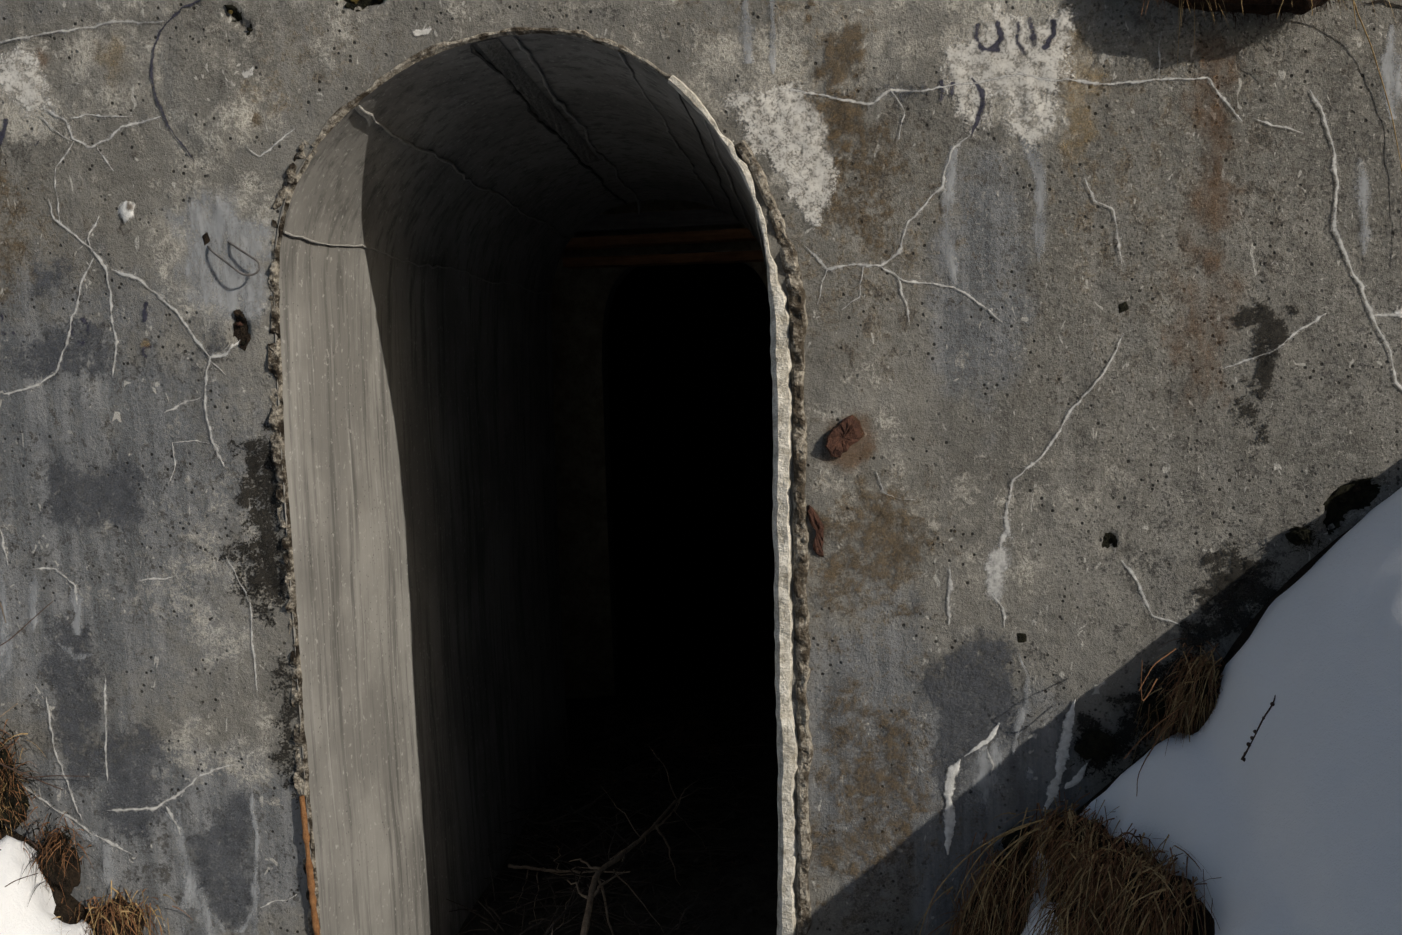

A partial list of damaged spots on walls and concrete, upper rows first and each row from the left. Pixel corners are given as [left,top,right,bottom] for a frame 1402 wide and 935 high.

spalling [344,0,383,12]
crack [0,0,240,484]
crack [778,34,1402,390]
rust [825,415,865,458]
crack [1007,333,1124,511]
crack [0,530,77,603]
crack [140,574,178,582]
crack [226,557,258,690]
spalling [725,83,840,935]
rust [807,505,824,557]
crack [1121,560,1195,634]
crack [25,677,234,854]